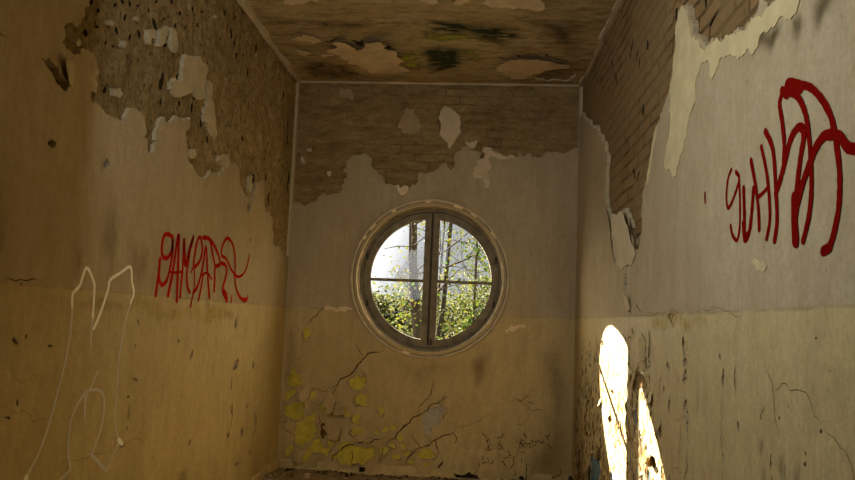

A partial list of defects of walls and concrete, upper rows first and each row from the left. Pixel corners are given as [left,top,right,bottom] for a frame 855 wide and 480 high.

flaking render [63,0,800,272]
crack [332,345,382,393]
peeling [279,367,438,467]
crack [387,378,495,468]
peeling [574,328,672,480]